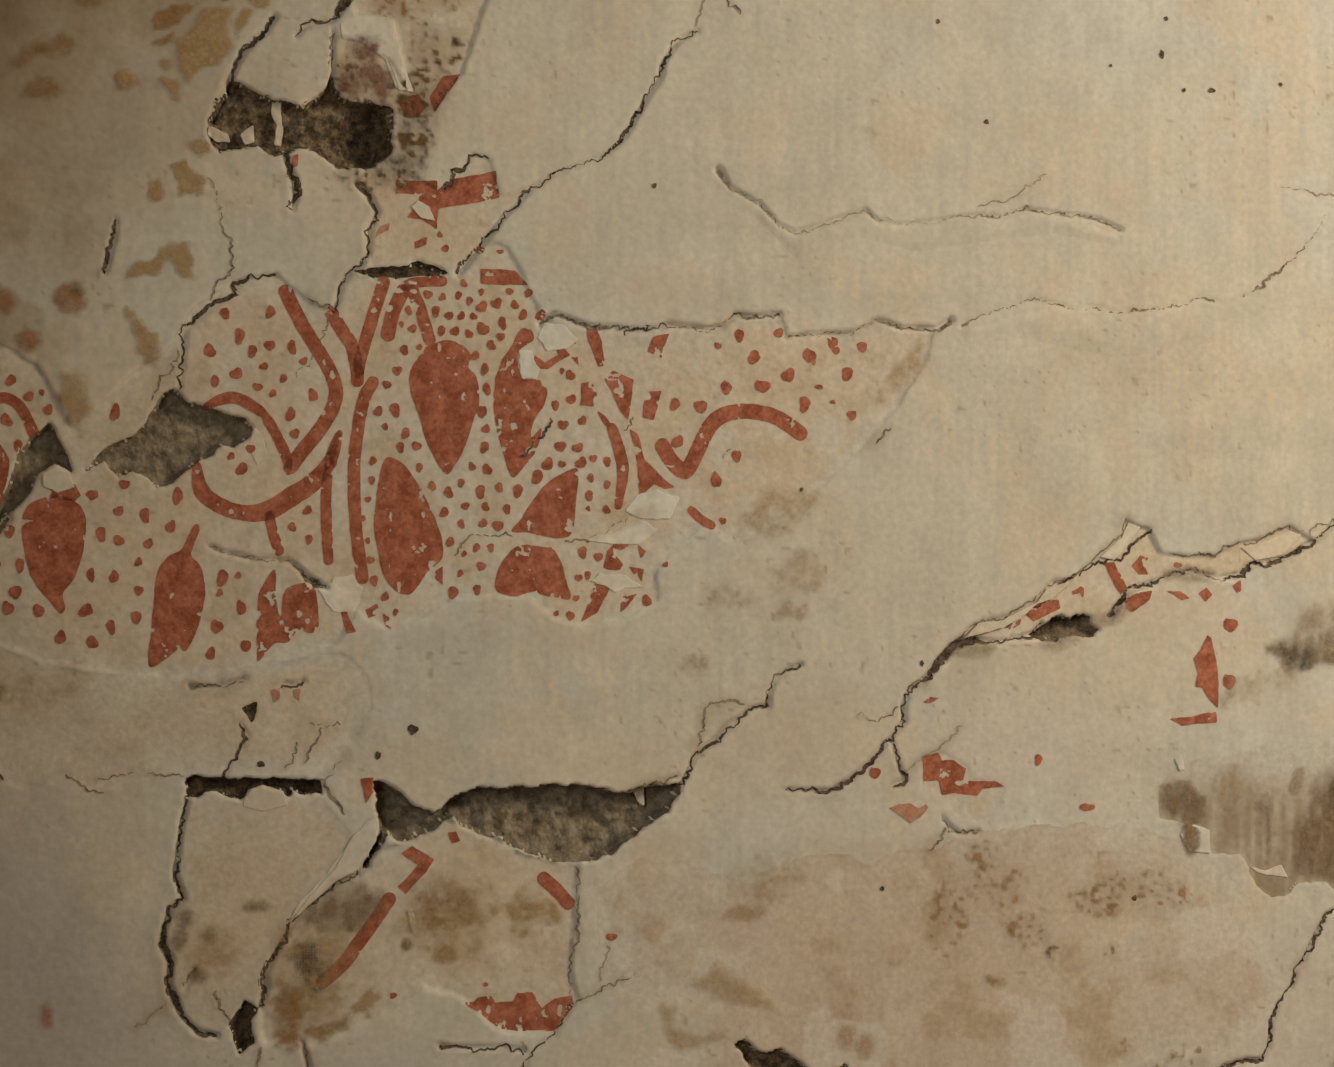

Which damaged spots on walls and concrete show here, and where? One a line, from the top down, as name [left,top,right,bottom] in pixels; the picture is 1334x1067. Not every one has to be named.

leakage [129,242,193,277]
leakage [149,140,209,201]
leakage [153,0,269,100]
crack [456,0,741,274]
peeling [0,0,935,1054]
crack [786,518,1334,795]
peeling [944,520,1317,663]
crack [65,772,378,1038]
crack [439,866,632,1067]
peeling [597,735,1334,1067]
leakage [1162,781,1205,854]
crack [1221,909,1334,1067]